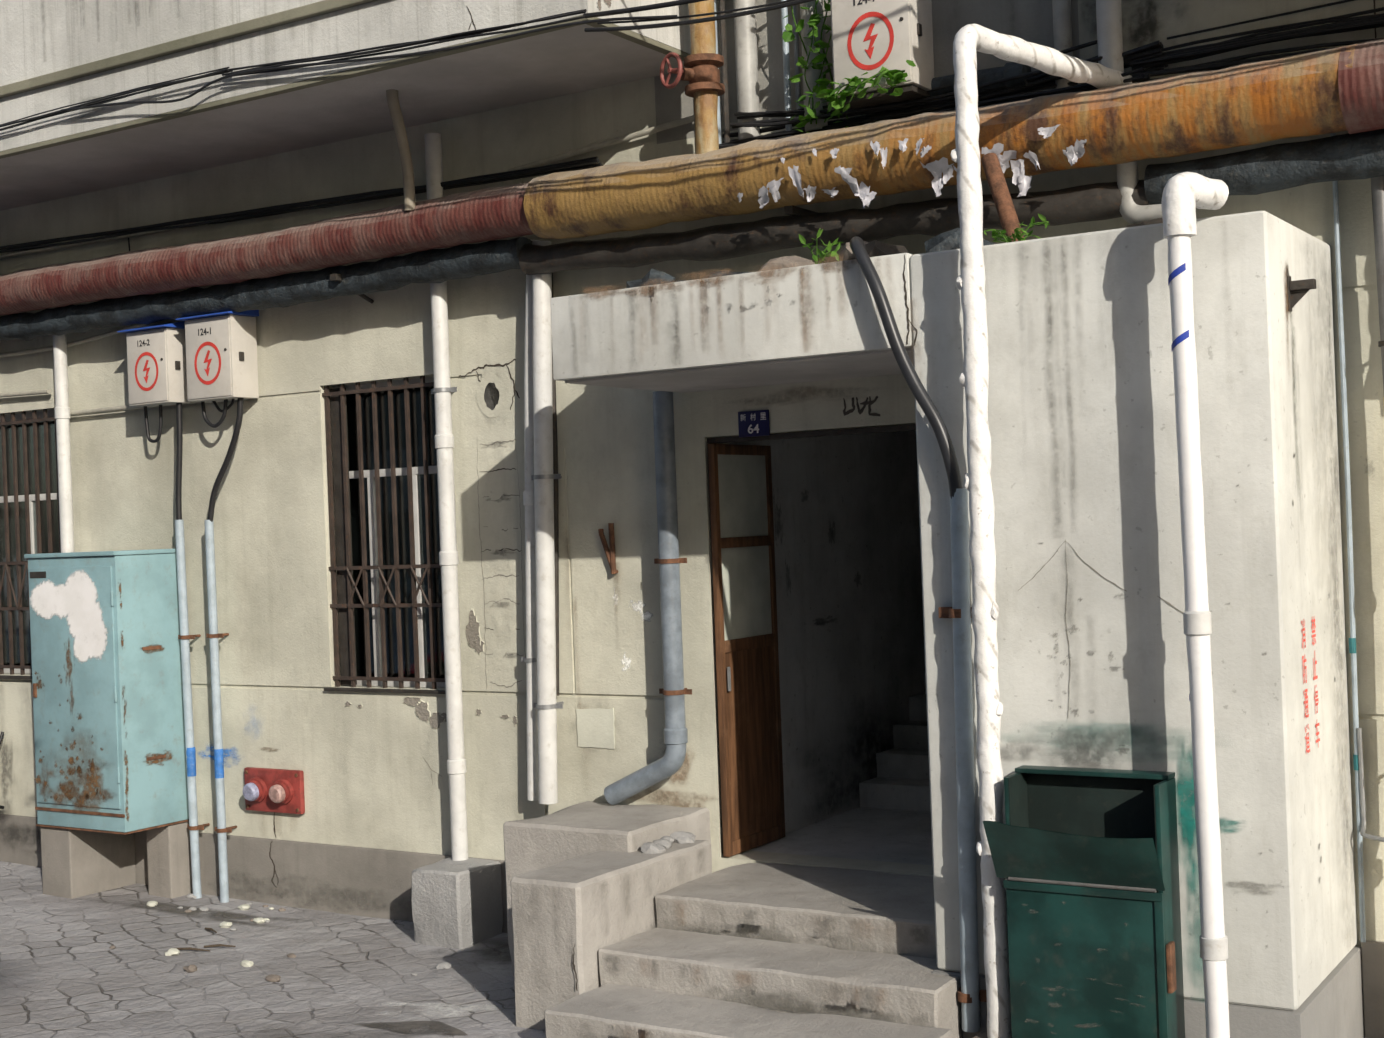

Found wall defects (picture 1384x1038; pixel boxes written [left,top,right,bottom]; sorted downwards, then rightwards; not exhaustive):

crack [459,359,526,689]
spalling [466,608,485,655]
spalling [403,696,447,729]
crack [571,946,579,991]